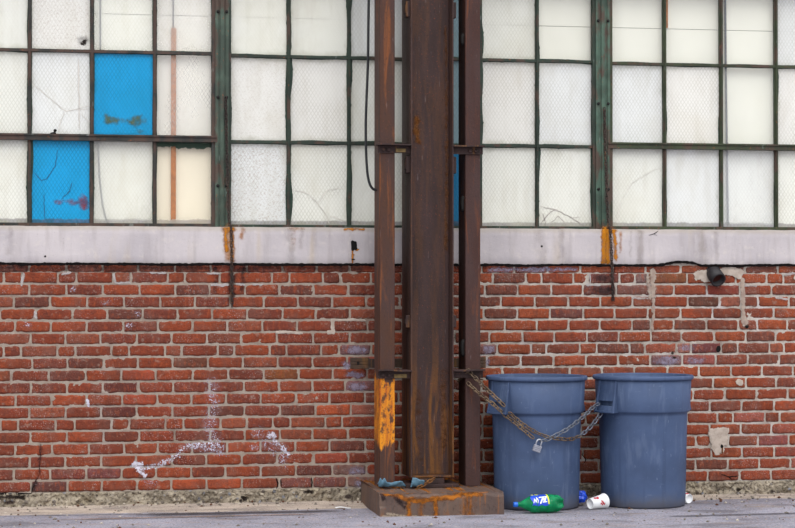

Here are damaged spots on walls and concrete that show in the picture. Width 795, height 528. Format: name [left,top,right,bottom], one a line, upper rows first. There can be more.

corrosion [223,226,243,262]
corrosion [599,227,622,265]
peeling [733,268,757,287]
corrosion [361,477,495,516]